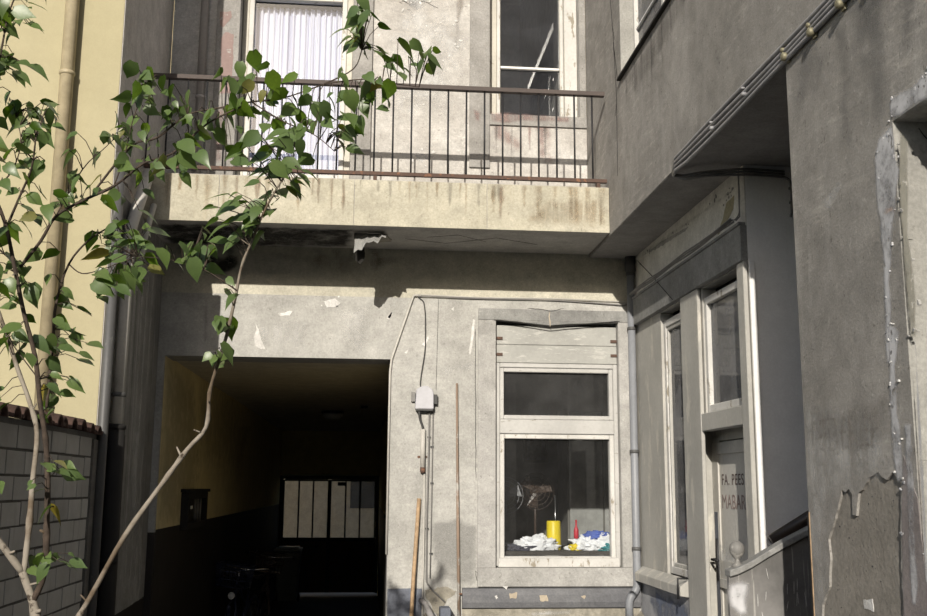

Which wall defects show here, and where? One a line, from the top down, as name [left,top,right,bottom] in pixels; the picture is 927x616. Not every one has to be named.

damp [161,225,350,246]
damp [209,256,237,272]
spalling [824,66,927,616]